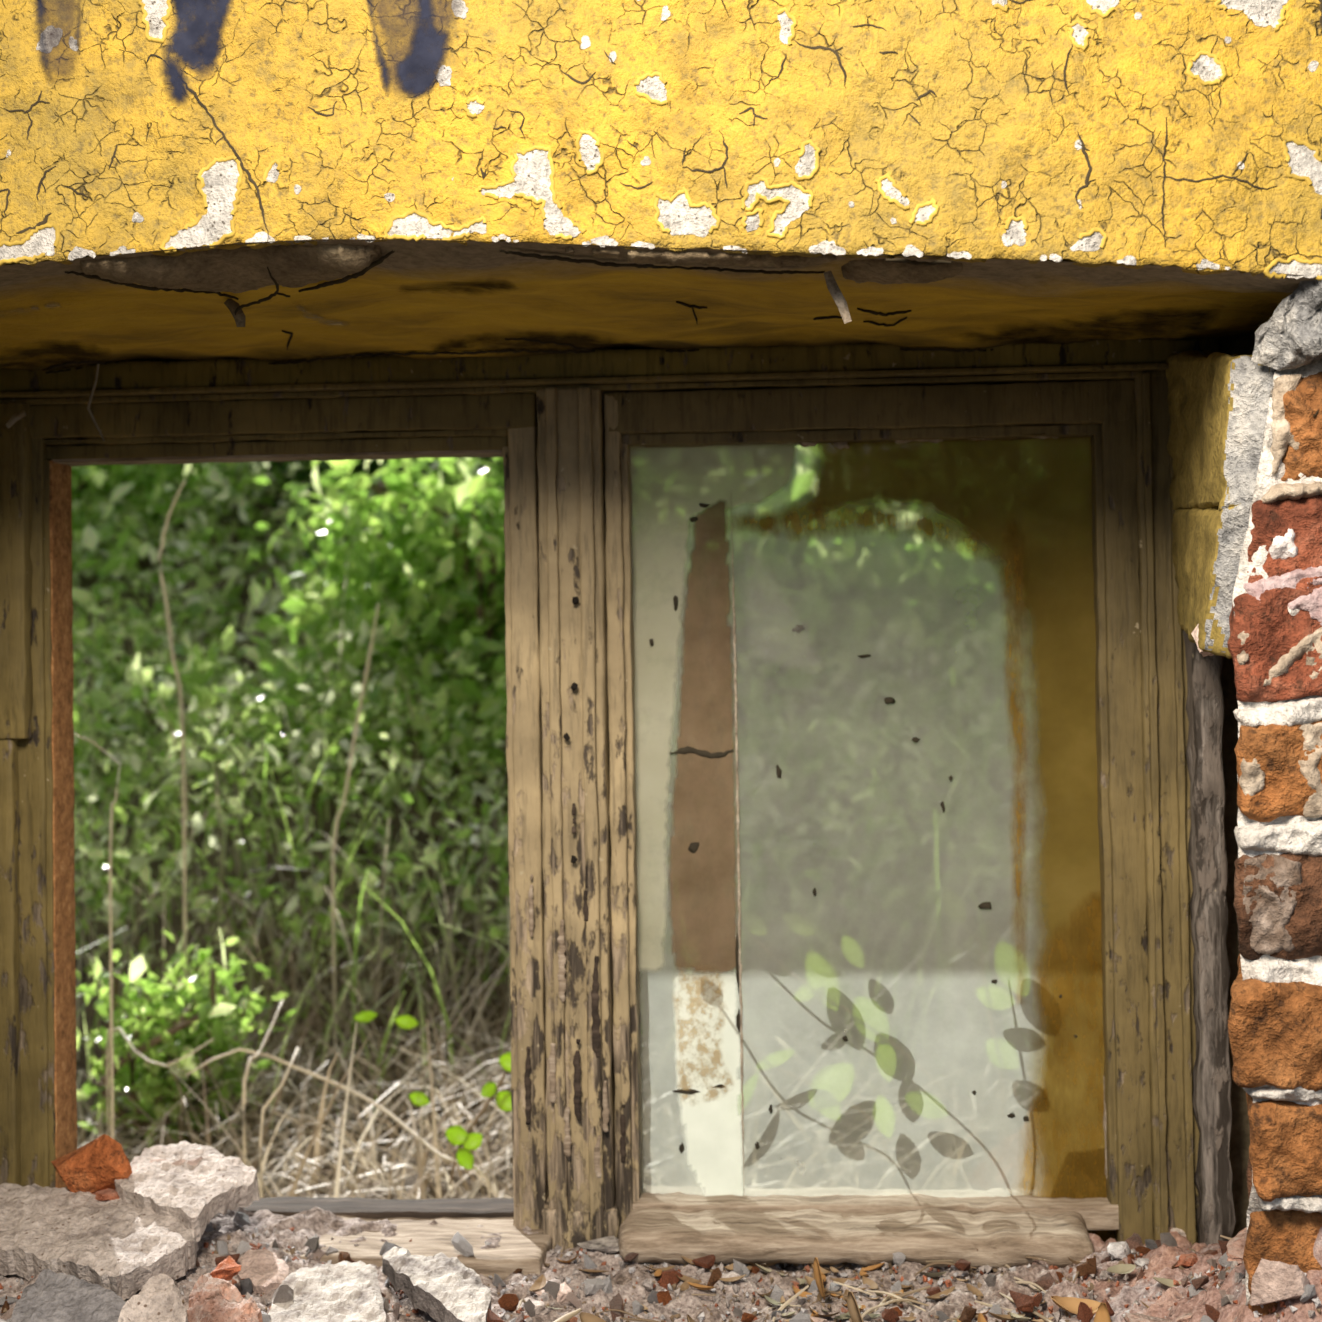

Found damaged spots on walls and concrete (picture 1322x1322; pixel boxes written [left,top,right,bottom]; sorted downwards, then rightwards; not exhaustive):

crack [627,24,898,188]
crack [0,166,87,233]
peeling [0,223,136,267]
peeling [159,155,275,253]
crack [65,54,395,315]
peeling [350,193,519,243]
peeling [478,145,721,249]
crack [500,250,825,274]
peeling [809,240,884,256]
crack [1075,131,1096,208]
crack [1156,117,1278,247]
flaking render [1227,255,1322,1316]